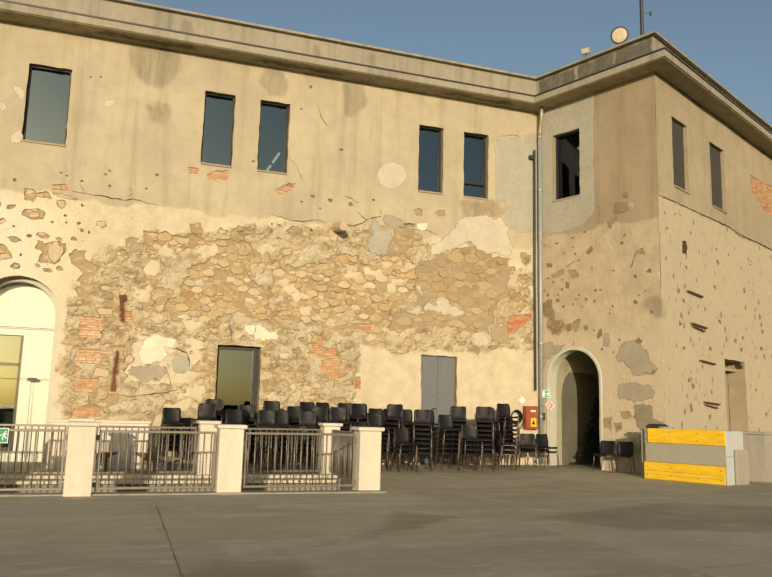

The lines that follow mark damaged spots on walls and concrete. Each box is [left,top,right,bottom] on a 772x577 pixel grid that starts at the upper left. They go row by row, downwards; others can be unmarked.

crack [72,182,158,205]
flaking render [189,167,228,182]
flaking render [750,175,772,216]
crack [659,193,772,251]
spalling [0,172,614,419]